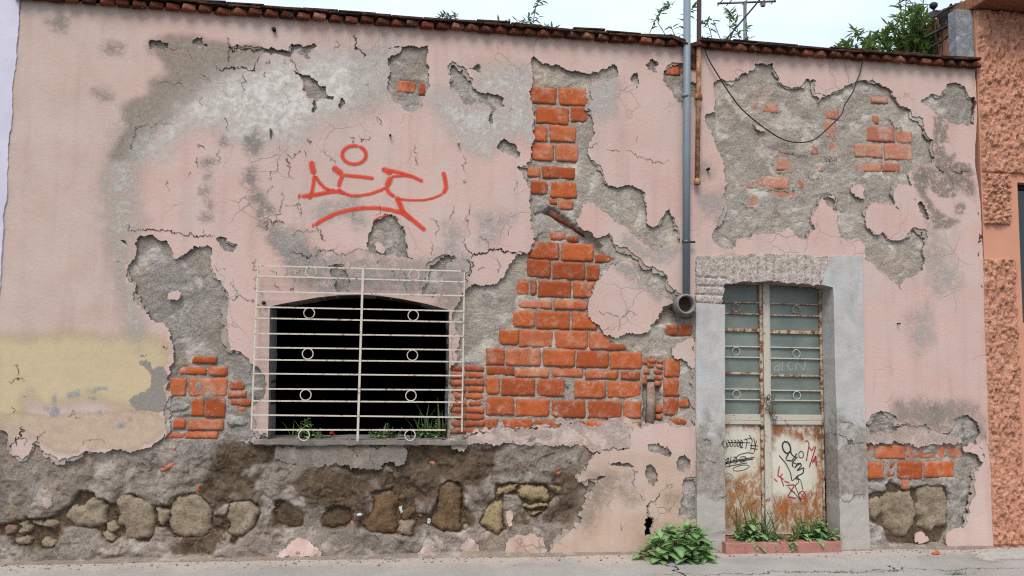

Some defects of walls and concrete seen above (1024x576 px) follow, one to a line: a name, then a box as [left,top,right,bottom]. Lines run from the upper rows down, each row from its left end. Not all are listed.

crack [216,37,306,90]
spalling [387,46,430,109]
spalling [921,83,973,126]
spalling [705,64,934,286]
crack [126,224,213,237]
crack [213,140,408,302]
spalling [0,57,696,562]
rust [772,425,821,458]
rust [725,471,822,531]
spalling [866,411,984,546]